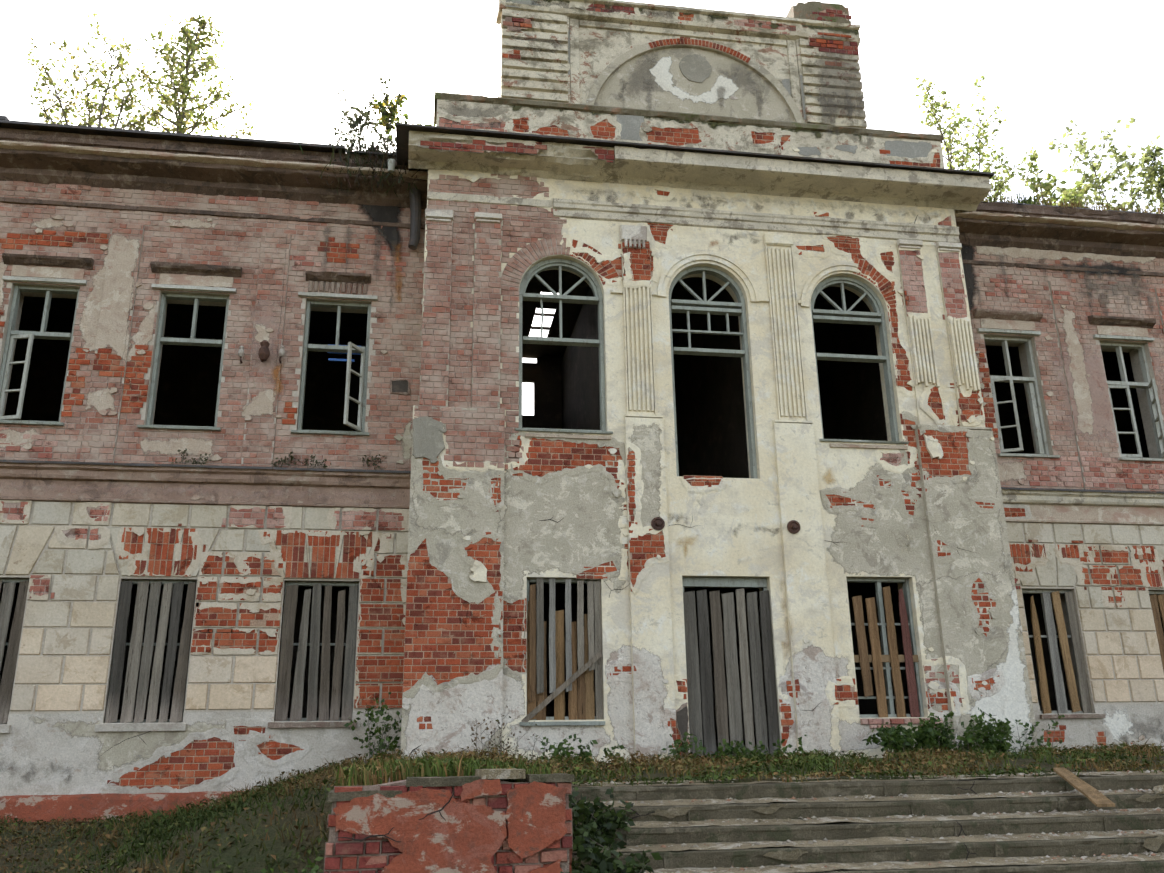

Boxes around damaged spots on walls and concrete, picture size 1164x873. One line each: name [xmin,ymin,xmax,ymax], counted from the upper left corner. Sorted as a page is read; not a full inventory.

flaking render [420,110,709,163]
peeling [836,144,857,154]
flaking render [53,171,690,760]
peeling [778,209,1164,755]
flaking render [29,716,314,794]
crack [338,792,455,842]